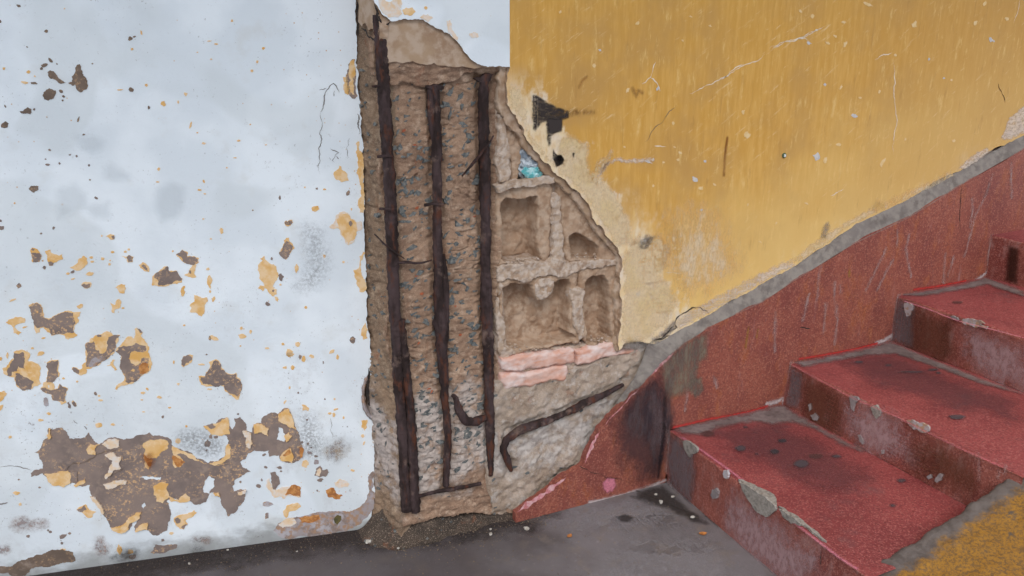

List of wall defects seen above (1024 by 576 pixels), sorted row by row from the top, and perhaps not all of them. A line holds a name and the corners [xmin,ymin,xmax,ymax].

crack [318,83,360,171]
rust [426,88,435,143]
spalling [0,0,682,559]
crack [651,307,708,342]
leakage [575,247,1024,526]